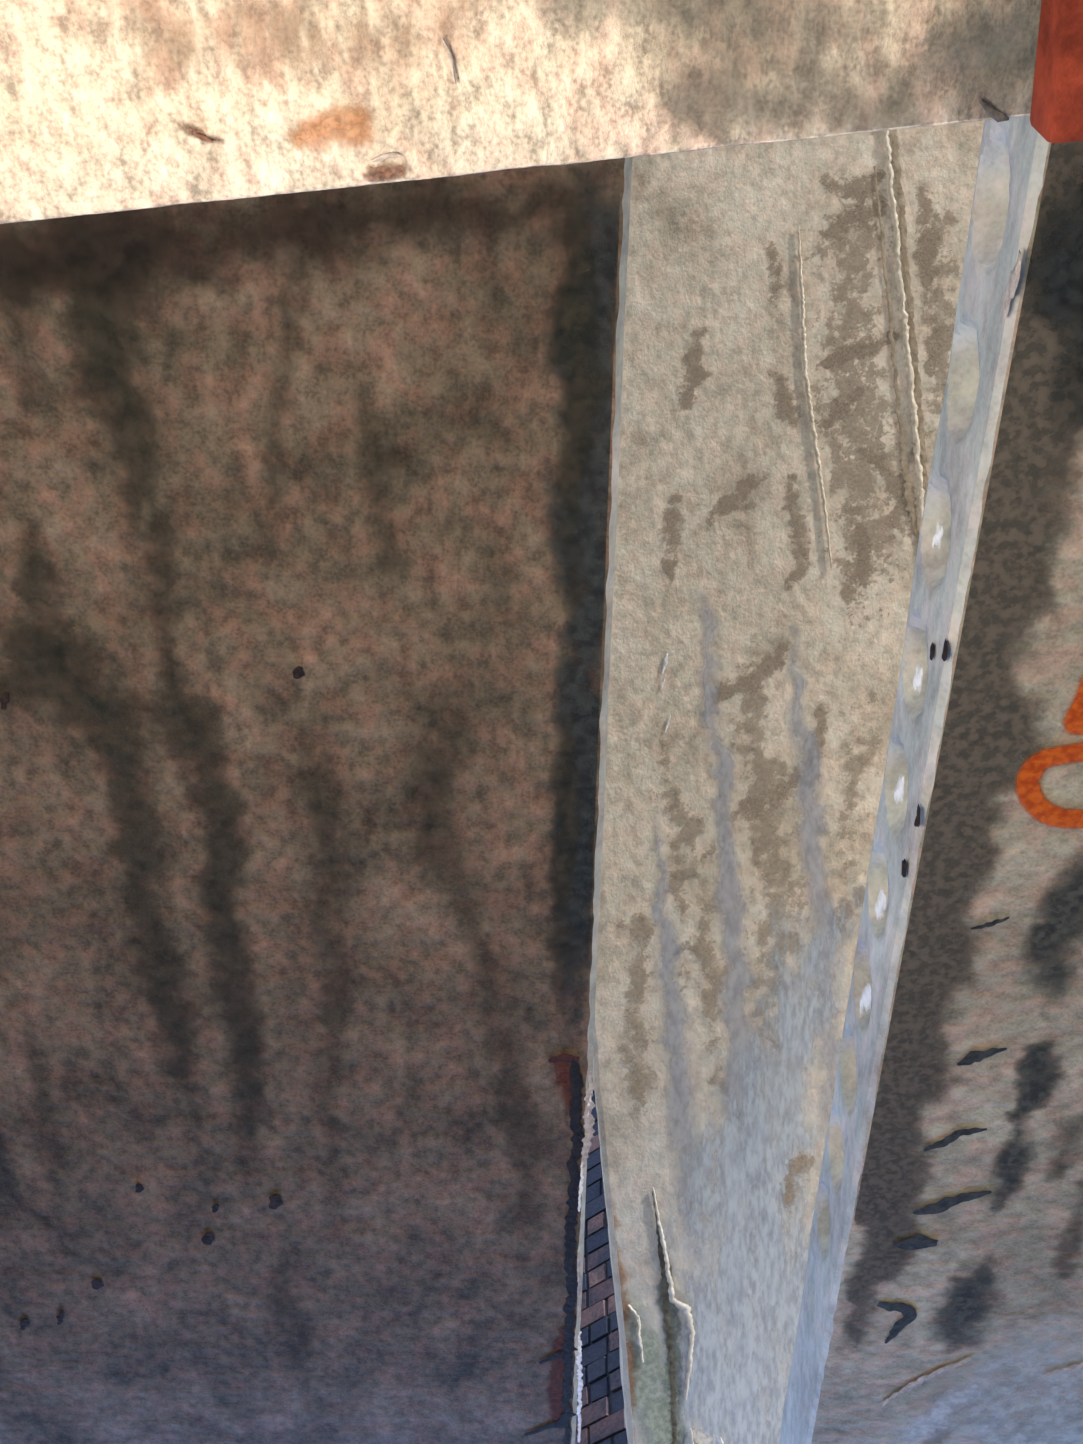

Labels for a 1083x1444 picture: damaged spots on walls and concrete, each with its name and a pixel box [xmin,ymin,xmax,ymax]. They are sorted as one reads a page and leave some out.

corrosion [294,109,368,147]
water stain [0,533,191,1078]
water stain [68,265,152,502]
water stain [159,674,261,1124]
water stain [549,191,619,988]
water stain [653,610,844,1444]
water stain [845,141,1083,1344]
corrosion [547,1326,565,1429]
flaking render [690,1428,724,1444]